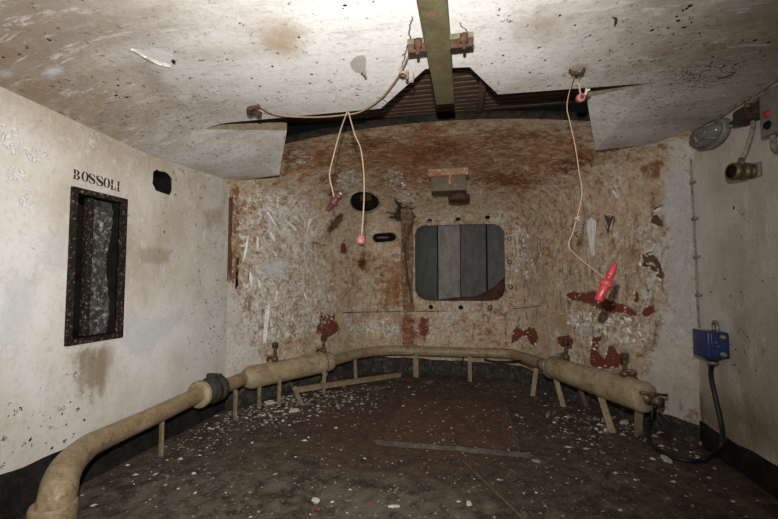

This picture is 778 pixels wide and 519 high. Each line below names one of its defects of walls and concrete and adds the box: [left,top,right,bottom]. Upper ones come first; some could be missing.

peeling [129,46,176,67]
peeling [587,214,615,256]
peeling [638,205,664,281]
peeling [227,191,397,344]
peeling [417,316,431,342]
peeling [510,327,539,348]
peeling [556,288,655,369]